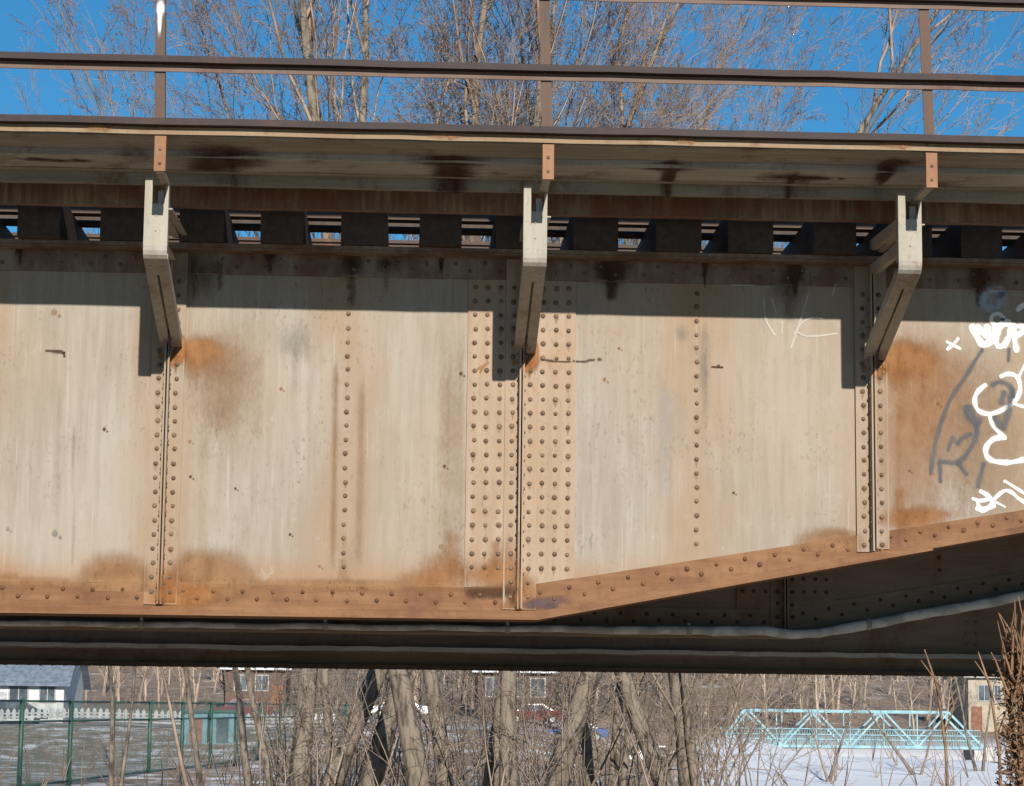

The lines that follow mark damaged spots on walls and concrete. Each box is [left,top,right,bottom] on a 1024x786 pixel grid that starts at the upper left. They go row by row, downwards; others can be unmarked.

corrosion [159,336,225,372]
corrosion [512,346,601,375]
corrosion [861,341,935,383]
corrosion [889,509,945,528]
corrosion [158,554,251,609]
corrosion [412,559,536,611]